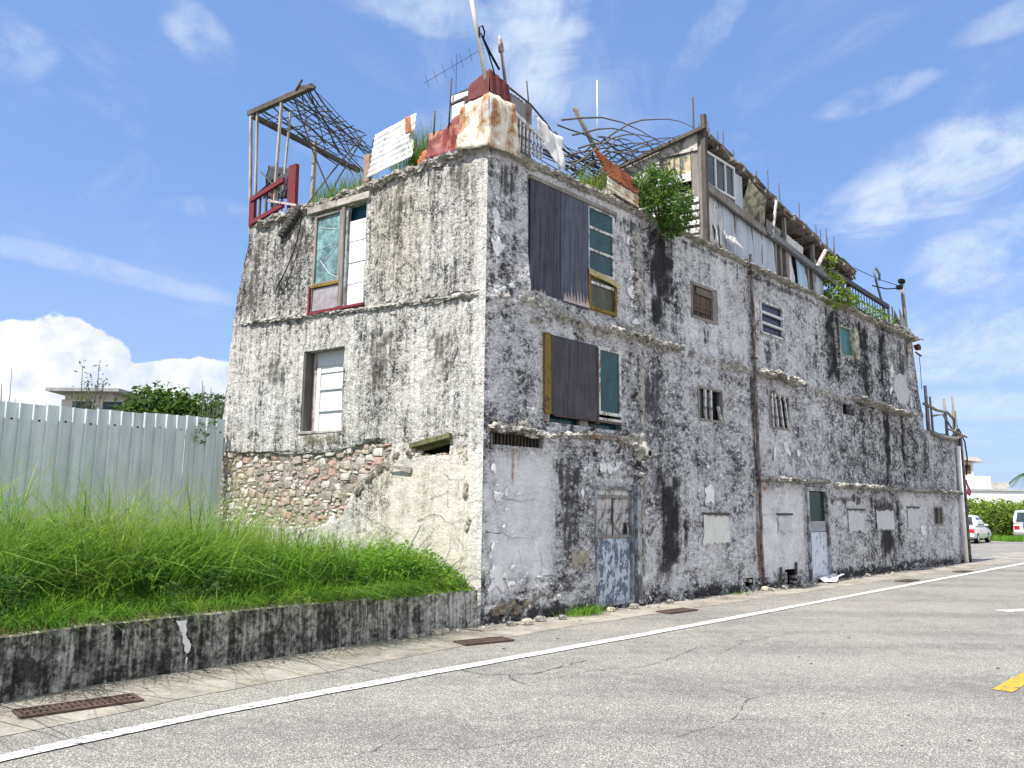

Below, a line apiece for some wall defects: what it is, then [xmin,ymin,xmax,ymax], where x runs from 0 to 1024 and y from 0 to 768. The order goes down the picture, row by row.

damp [614,216,742,327]
spalling [218,442,413,530]
damp [656,469,688,575]
peeling [486,524,591,616]
peeling [176,620,191,663]